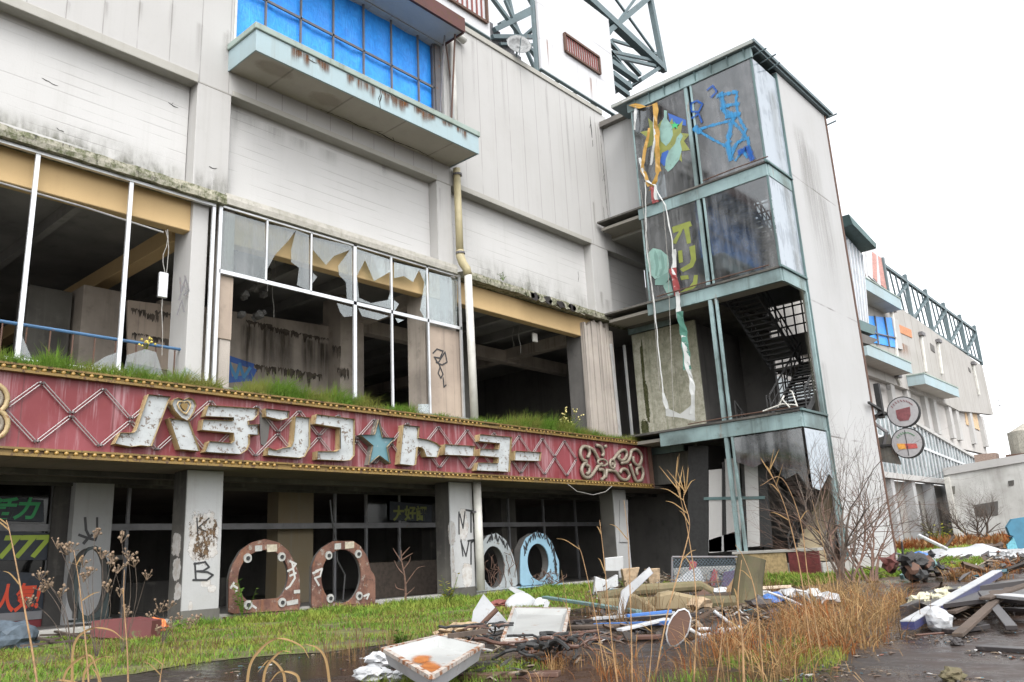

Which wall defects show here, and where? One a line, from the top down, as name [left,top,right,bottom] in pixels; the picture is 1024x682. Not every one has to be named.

rust [347,74,466,136]
peeling [172,510,219,611]